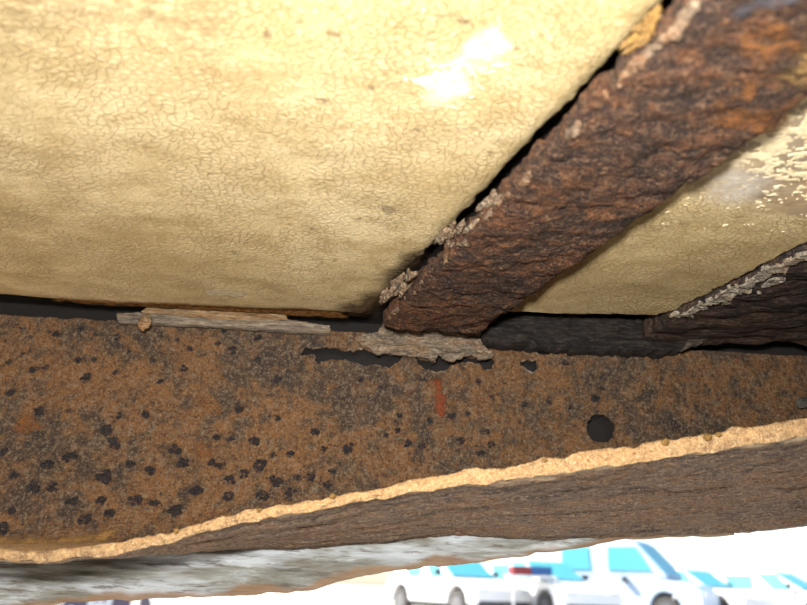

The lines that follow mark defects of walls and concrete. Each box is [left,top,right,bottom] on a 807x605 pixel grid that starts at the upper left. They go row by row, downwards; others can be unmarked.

peeling [403,28,521,111]
rust [738,23,807,85]
peeling [713,97,807,210]
spalling [301,347,402,368]
spalling [414,356,494,381]
spalling [518,350,552,374]